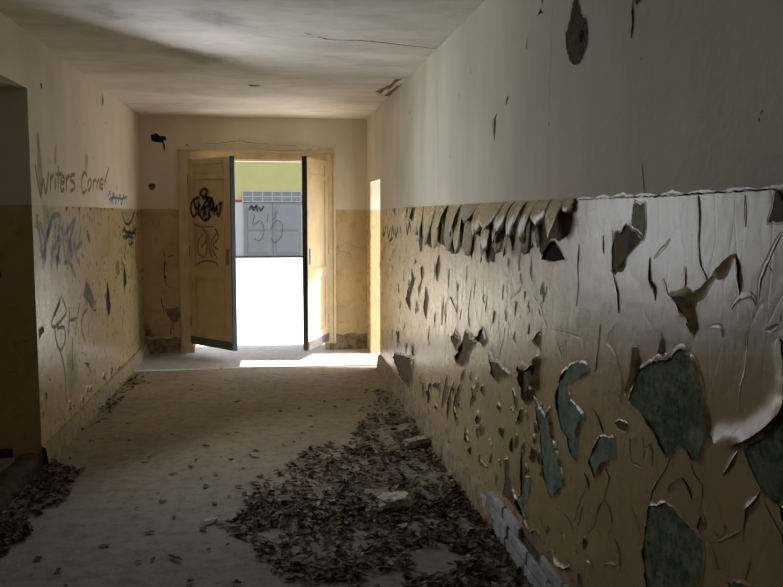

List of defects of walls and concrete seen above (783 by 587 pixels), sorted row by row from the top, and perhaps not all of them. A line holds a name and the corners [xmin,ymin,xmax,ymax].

flaking render [565,0,589,67]
hole [150,132,168,154]
peeling [611,200,647,275]
crack [577,168,783,309]
peeling [767,187,783,225]
peeling [667,287,697,336]
peeling [392,198,617,587]
peeling [627,334,712,466]
crack [737,314,781,410]
peeling [740,408,783,523]
peeling [641,498,706,587]